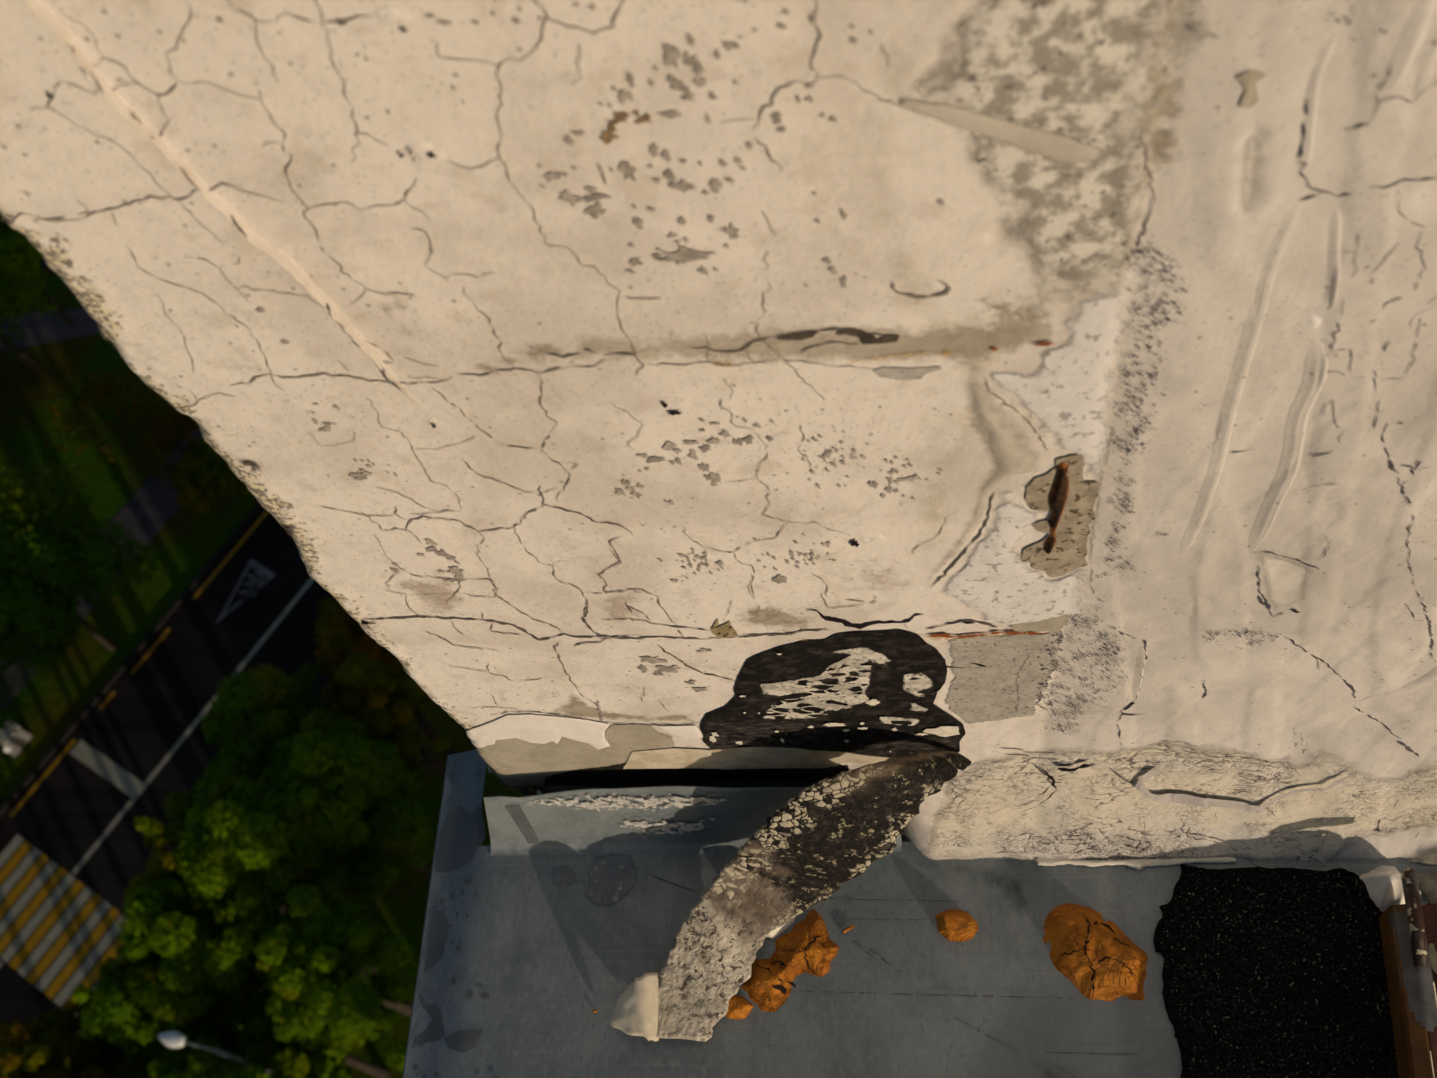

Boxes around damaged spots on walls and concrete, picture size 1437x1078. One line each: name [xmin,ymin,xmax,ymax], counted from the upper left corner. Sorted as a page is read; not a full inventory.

leakage [1136,0,1218,188]
crack [1344,66,1437,130]
crack [1121,127,1156,267]
crack [2,0,998,726]
peeling [739,0,1202,743]
crack [983,377,1048,451]
crack [1298,101,1437,662]
peeling [479,725,674,794]
peeling [670,548,724,583]
crack [947,632,1307,813]
crack [1181,813,1260,867]
crack [1257,542,1419,757]